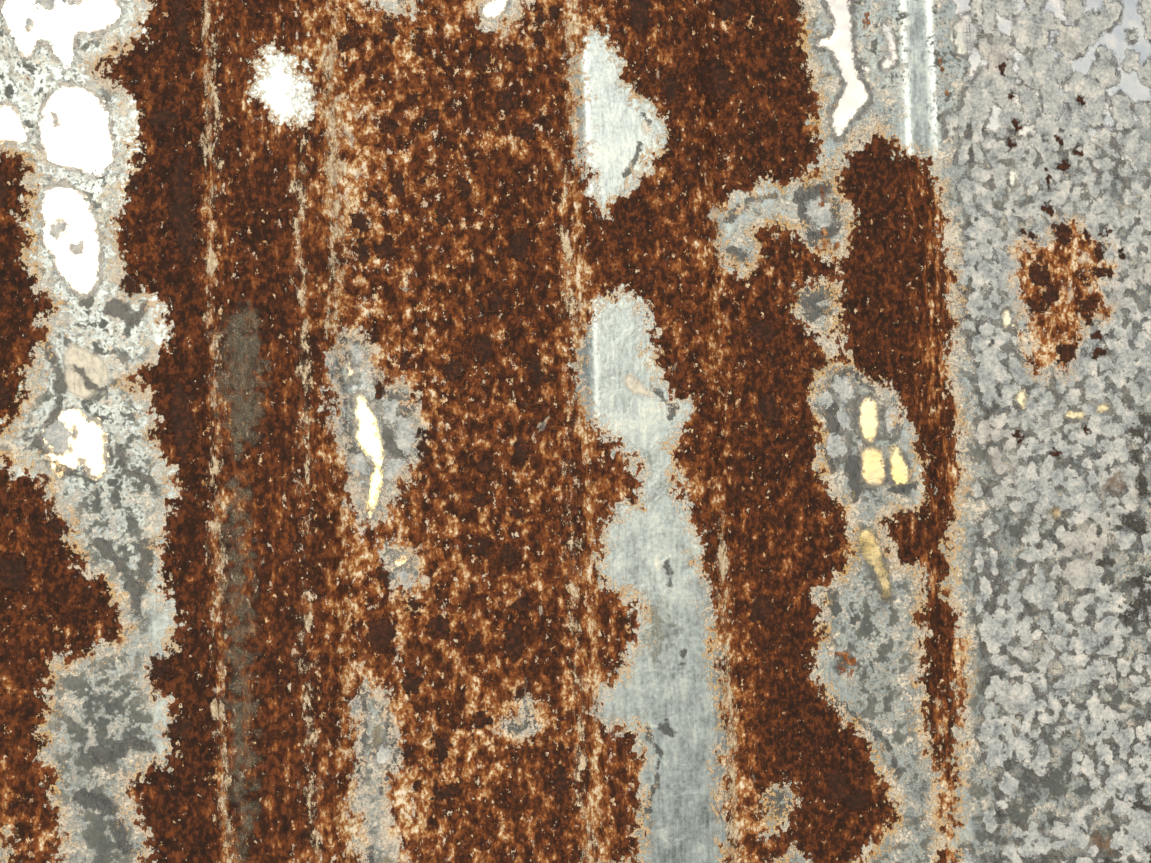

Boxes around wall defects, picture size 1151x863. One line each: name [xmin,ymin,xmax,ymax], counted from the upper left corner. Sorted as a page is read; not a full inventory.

peeling [813,0,899,142]
rust [852,0,907,71]
peeling [950,0,1151,196]
peeling [0,0,125,299]
peeling [1001,306,1015,332]
peeling [1013,390,1028,409]
peeling [1064,402,1110,424]